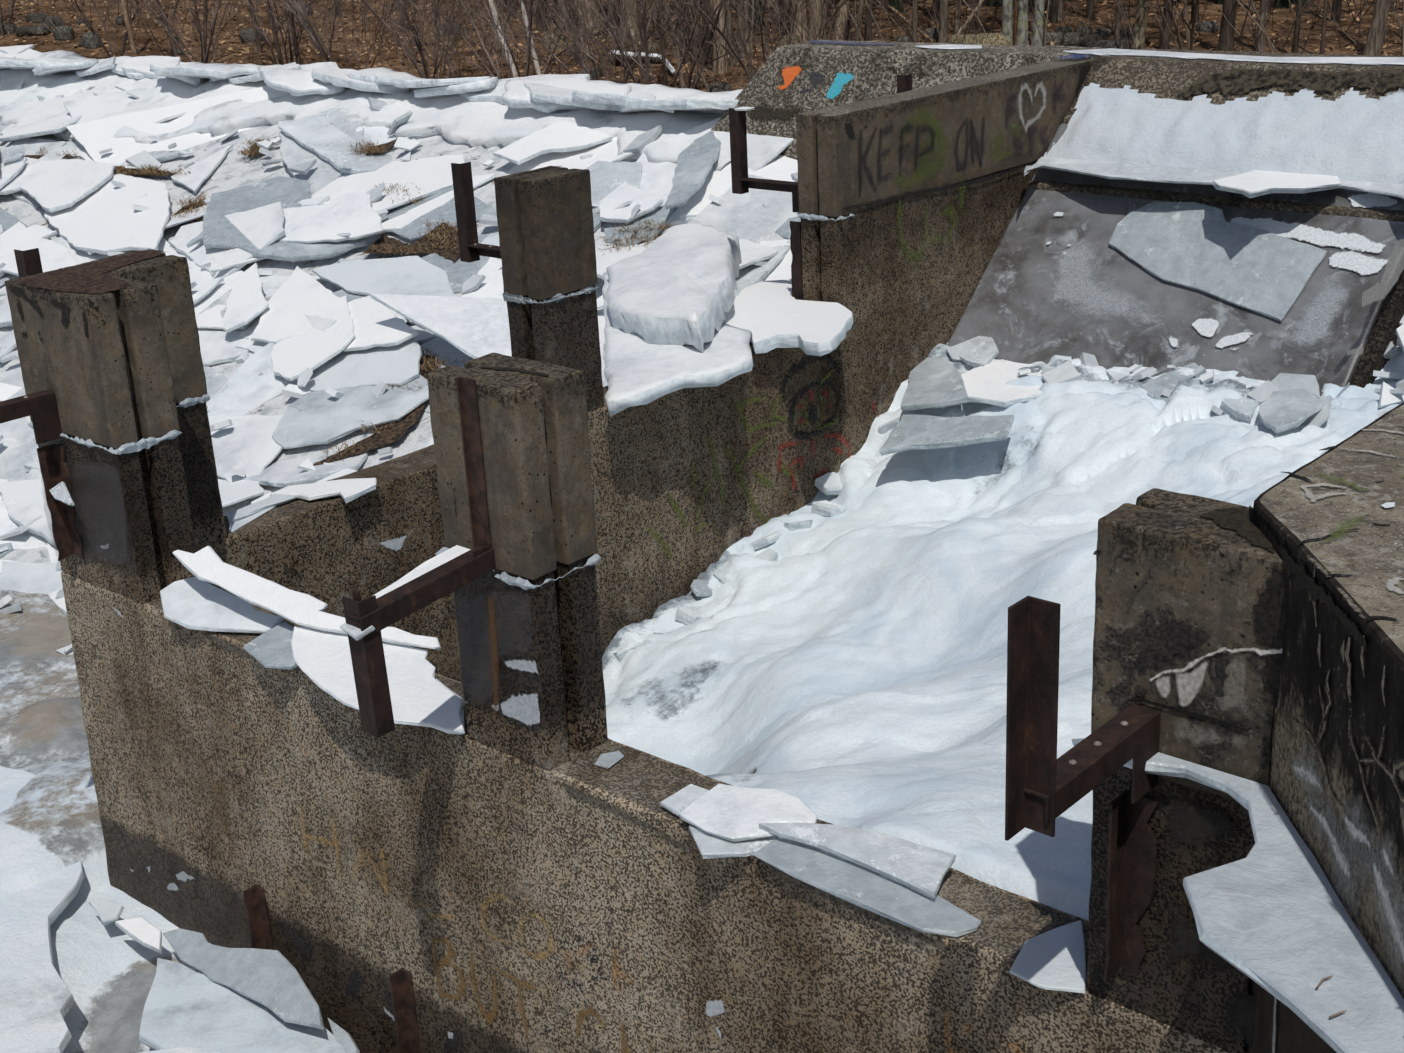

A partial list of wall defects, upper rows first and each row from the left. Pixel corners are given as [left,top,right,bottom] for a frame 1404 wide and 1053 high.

crack [1129,647,1282,732]